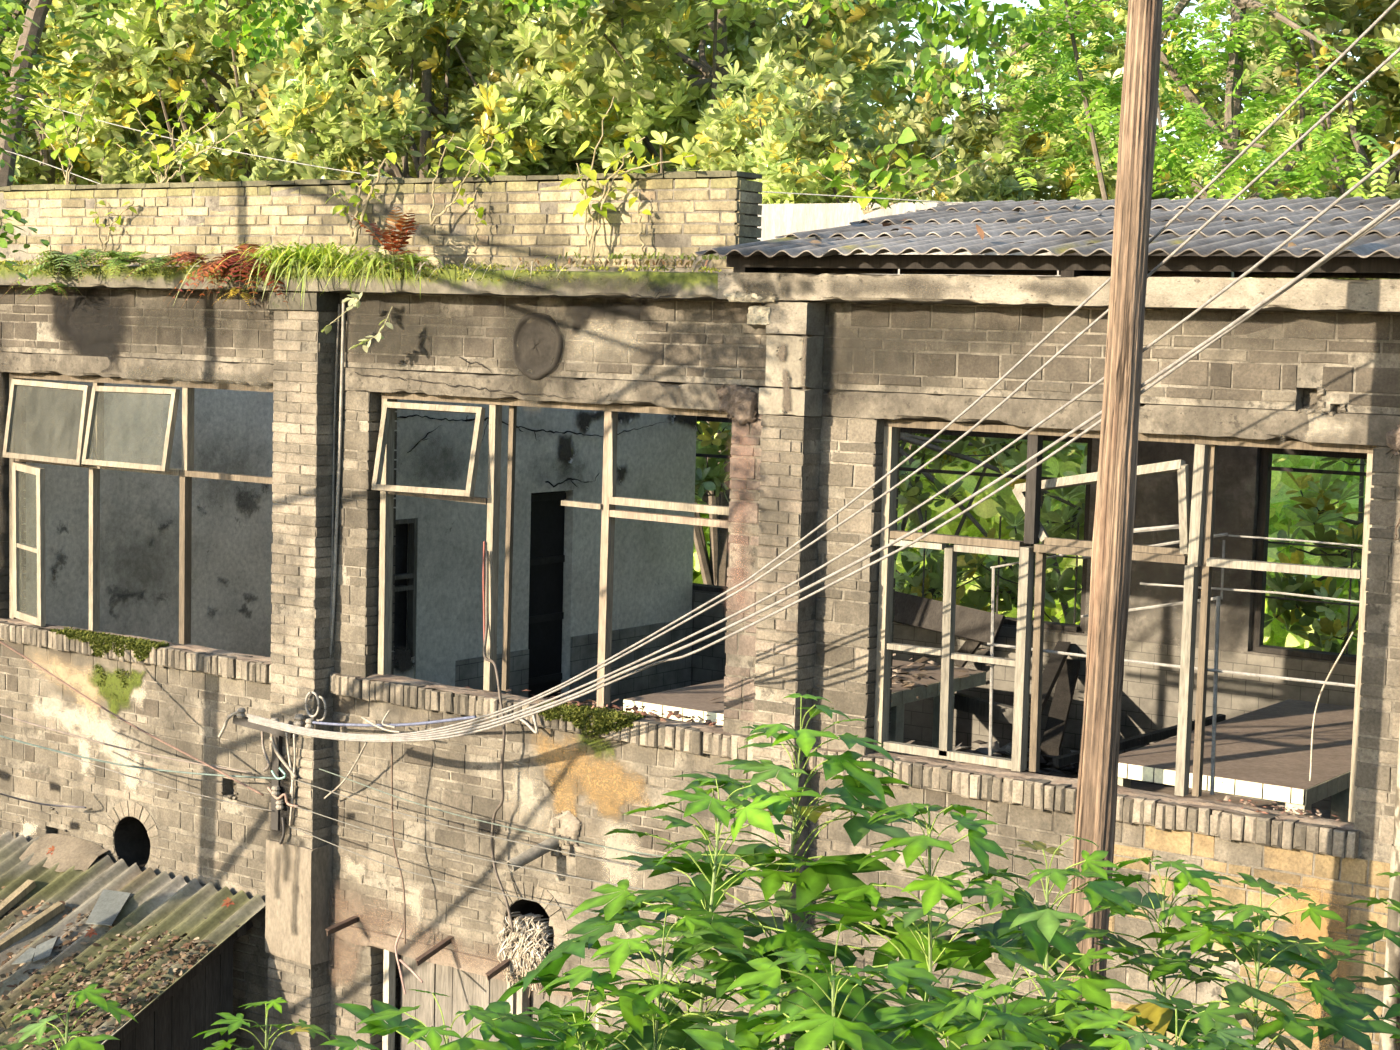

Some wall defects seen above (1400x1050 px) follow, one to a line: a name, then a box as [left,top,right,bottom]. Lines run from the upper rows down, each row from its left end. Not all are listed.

leakage [52,296,117,360]
crack [355,356,673,453]
spalling [715,383,758,426]
crack [545,474,599,488]
leakage [36,659,145,789]